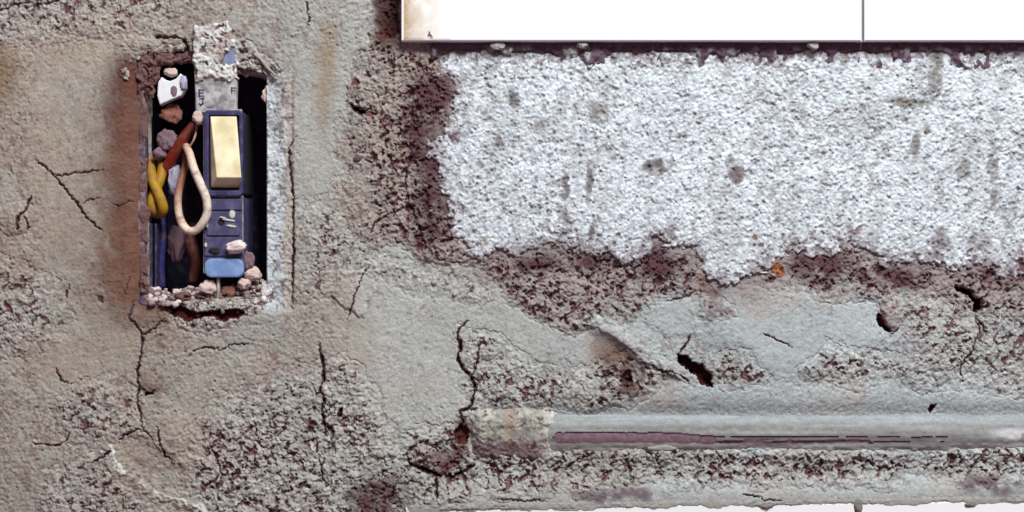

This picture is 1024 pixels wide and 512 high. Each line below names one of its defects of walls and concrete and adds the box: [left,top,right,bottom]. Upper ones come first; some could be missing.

crack [35,160,134,232]
crack [288,136,297,302]
flaking render [287,0,1024,401]
crack [93,277,172,464]
spalling [138,298,268,337]
crack [188,343,253,357]
crack [316,344,337,479]
crack [388,320,481,503]
crack [959,312,987,382]